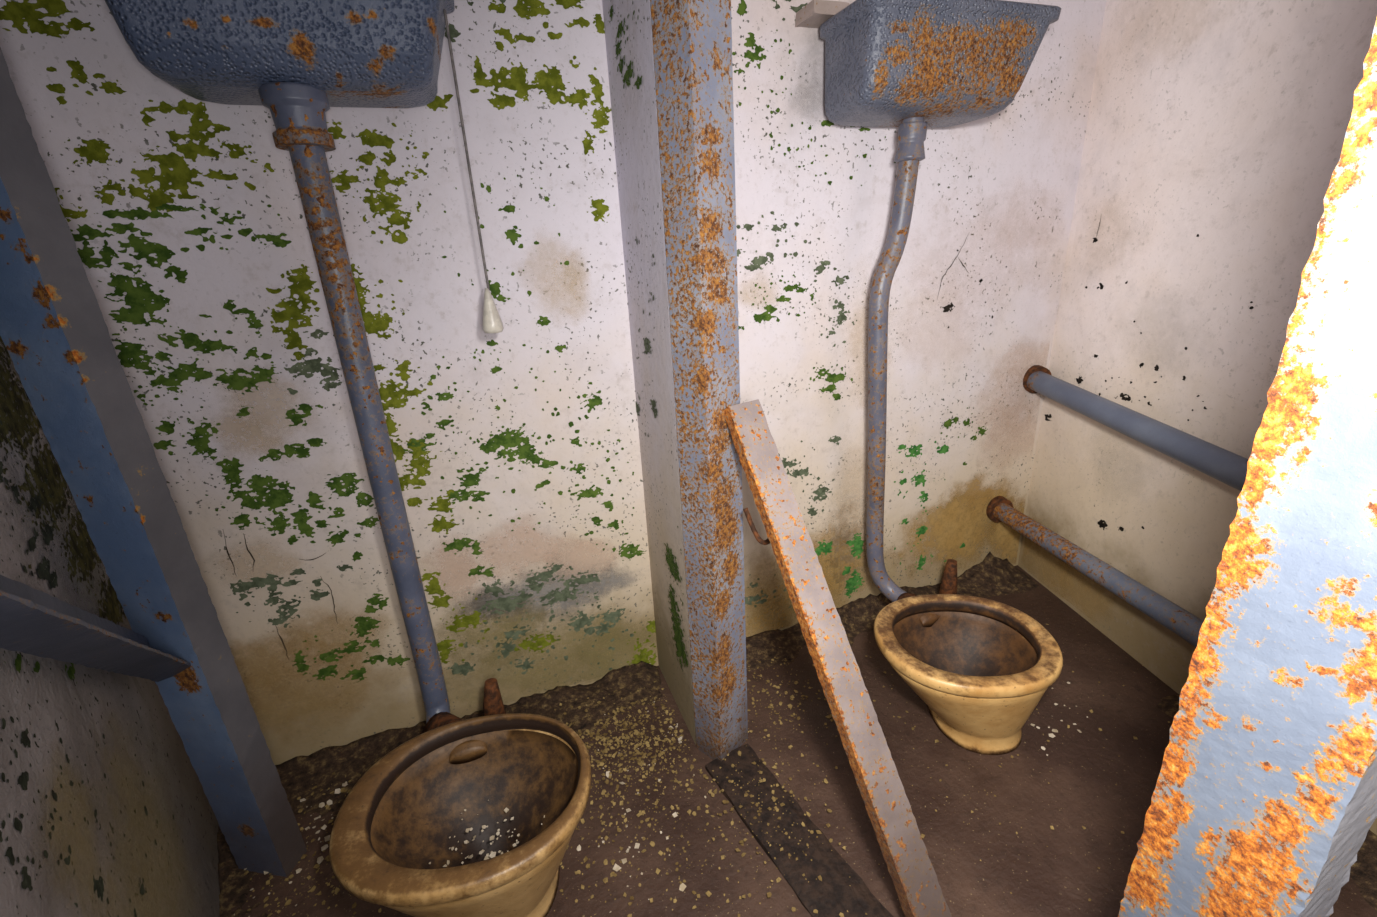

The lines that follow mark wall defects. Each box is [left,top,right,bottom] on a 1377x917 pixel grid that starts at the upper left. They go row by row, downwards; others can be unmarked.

water stain [0,336,126,627]
water stain [457,529,641,689]